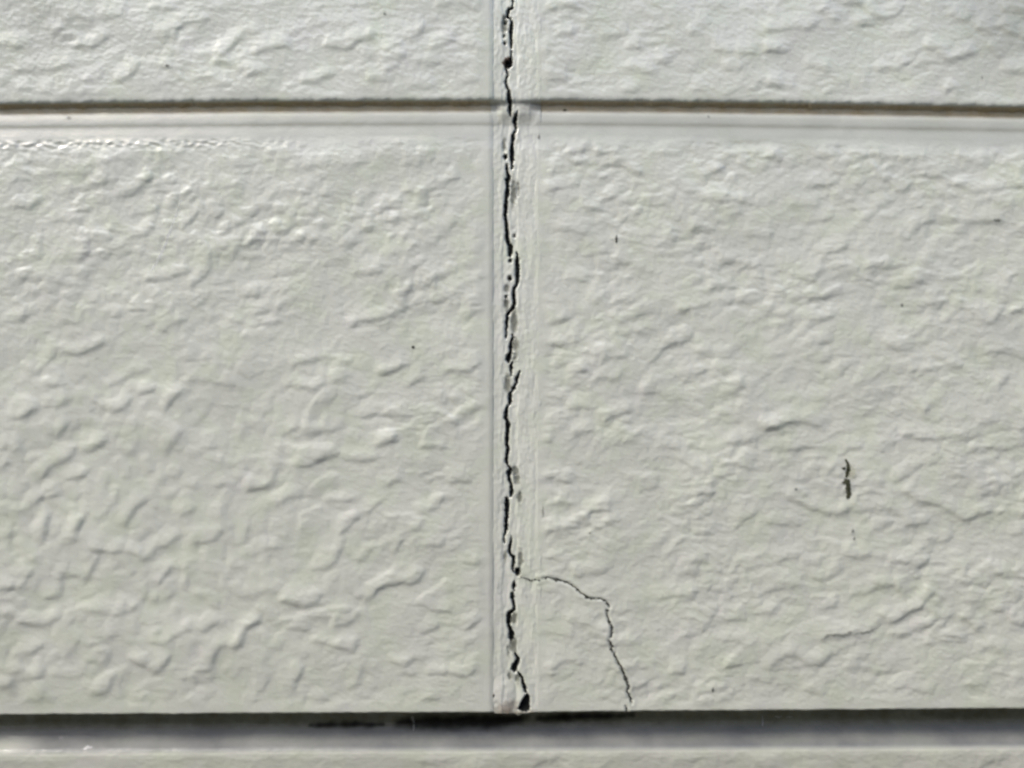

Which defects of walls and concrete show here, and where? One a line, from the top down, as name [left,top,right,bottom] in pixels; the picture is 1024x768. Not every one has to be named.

crack [502,0,632,712]